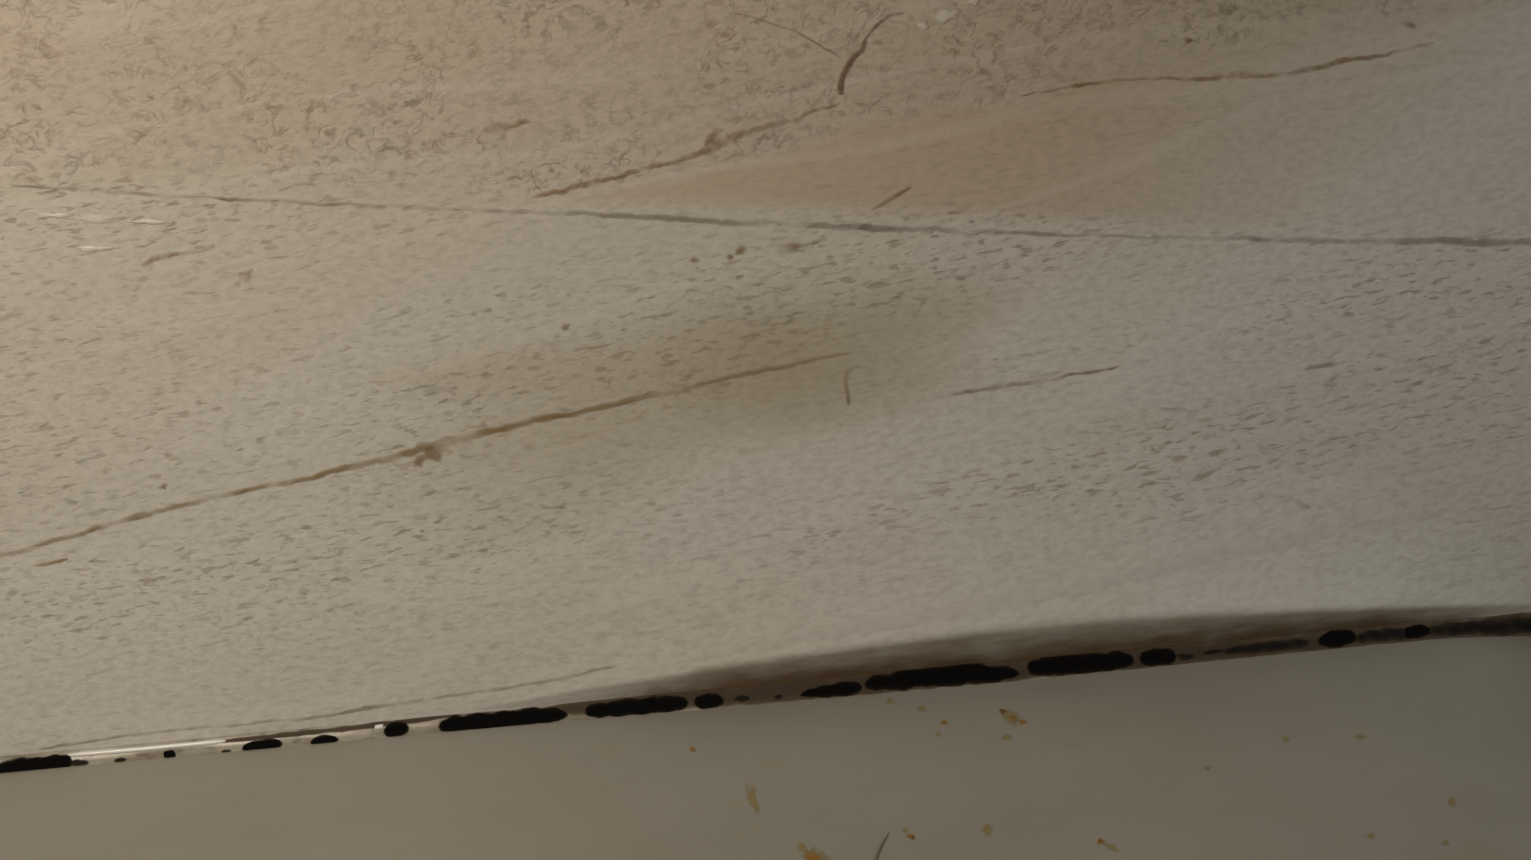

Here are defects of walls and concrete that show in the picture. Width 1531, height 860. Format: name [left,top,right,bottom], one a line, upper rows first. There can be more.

crack [838,24,878,94]
crack [1318,56,1368,68]
crack [541,172,628,196]
crack [699,361,808,385]
crack [481,397,639,435]
crack [400,447,430,456]
crack [236,465,348,494]
crack [42,515,138,566]
water stain [221,613,1531,752]
water stain [0,754,88,773]